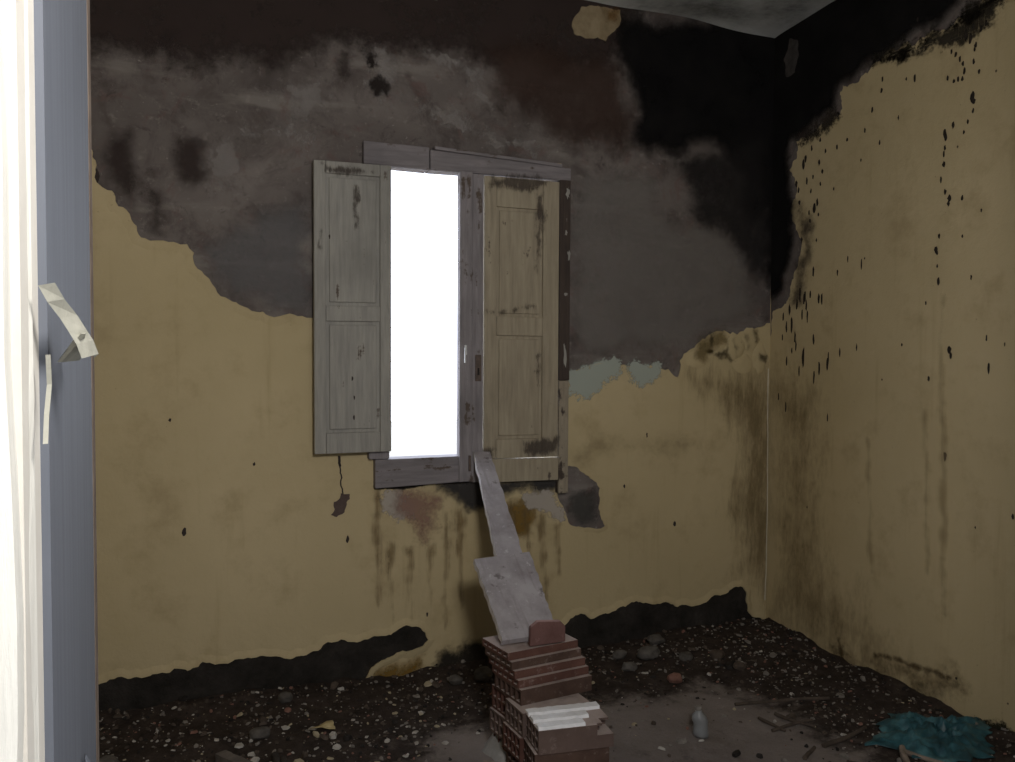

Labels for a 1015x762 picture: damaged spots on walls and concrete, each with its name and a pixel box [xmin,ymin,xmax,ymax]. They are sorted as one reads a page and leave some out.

peeling [90,0,983,384]
leakage [782,289,841,385]
leakage [376,489,440,537]
leakage [508,500,544,535]
flaking render [557,466,608,533]
flaking render [561,580,764,648]
flaking render [98,618,435,711]